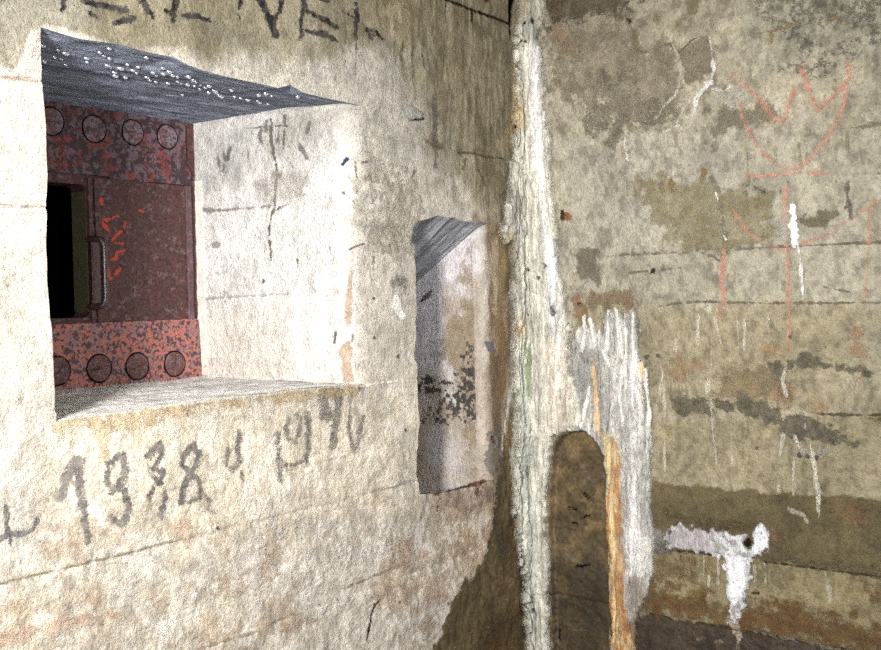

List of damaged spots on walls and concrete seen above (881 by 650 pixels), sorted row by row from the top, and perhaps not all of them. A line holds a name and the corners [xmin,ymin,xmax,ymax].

leakage [417,339,476,425]
corrosion [591,358,638,650]
leakage [432,0,881,650]
corrosion [640,553,881,650]